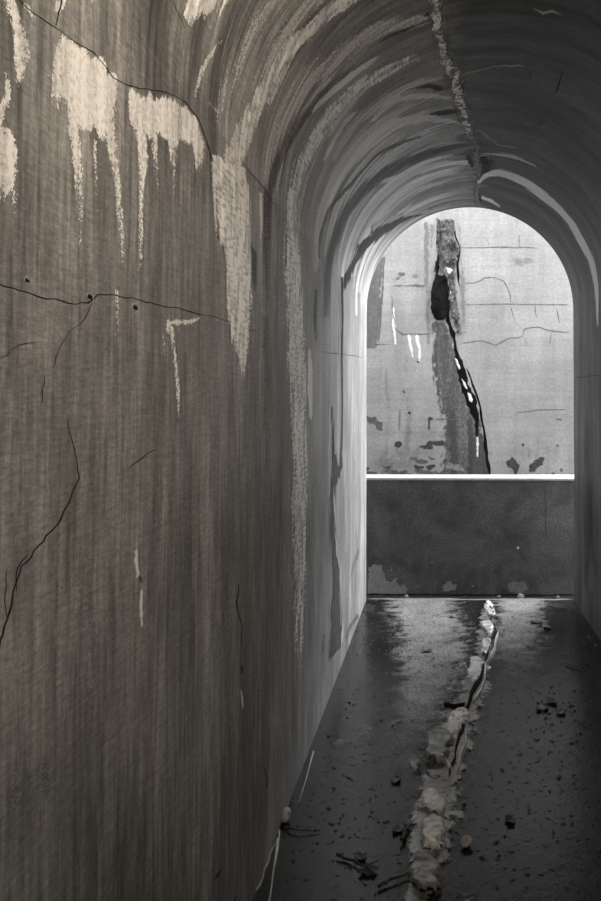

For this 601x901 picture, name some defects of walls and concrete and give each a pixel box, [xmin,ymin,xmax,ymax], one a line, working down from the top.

crack [5,0,211,161]
crack [0,284,228,402]
damp [48,0,469,667]
crack [323,218,569,474]
crack [427,0,531,206]
damp [479,152,538,170]
damp [477,169,599,324]
crack [0,425,80,647]
spalling [506,437,559,475]
crack [444,600,499,775]